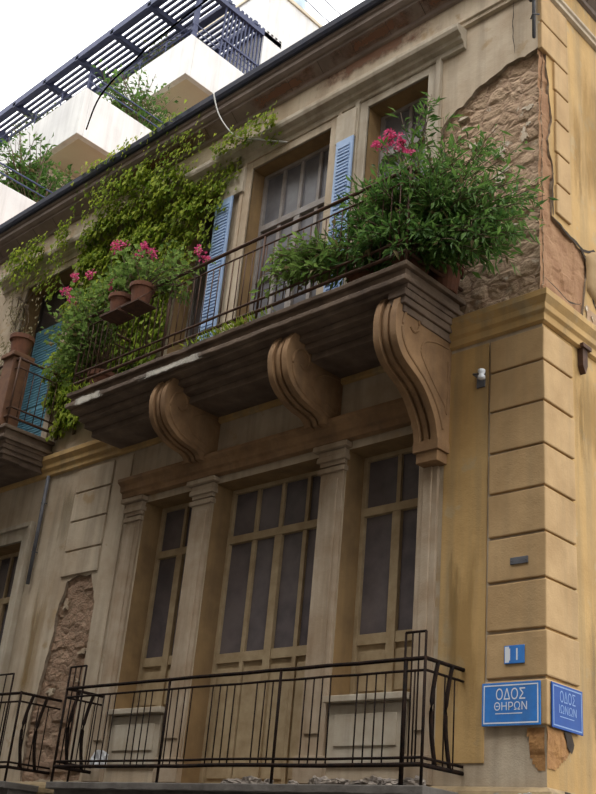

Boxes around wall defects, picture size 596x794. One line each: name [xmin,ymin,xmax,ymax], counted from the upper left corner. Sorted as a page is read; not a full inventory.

flaking render [443,48,596,326]
flaking render [22,575,95,782]
flaking render [527,727,574,771]